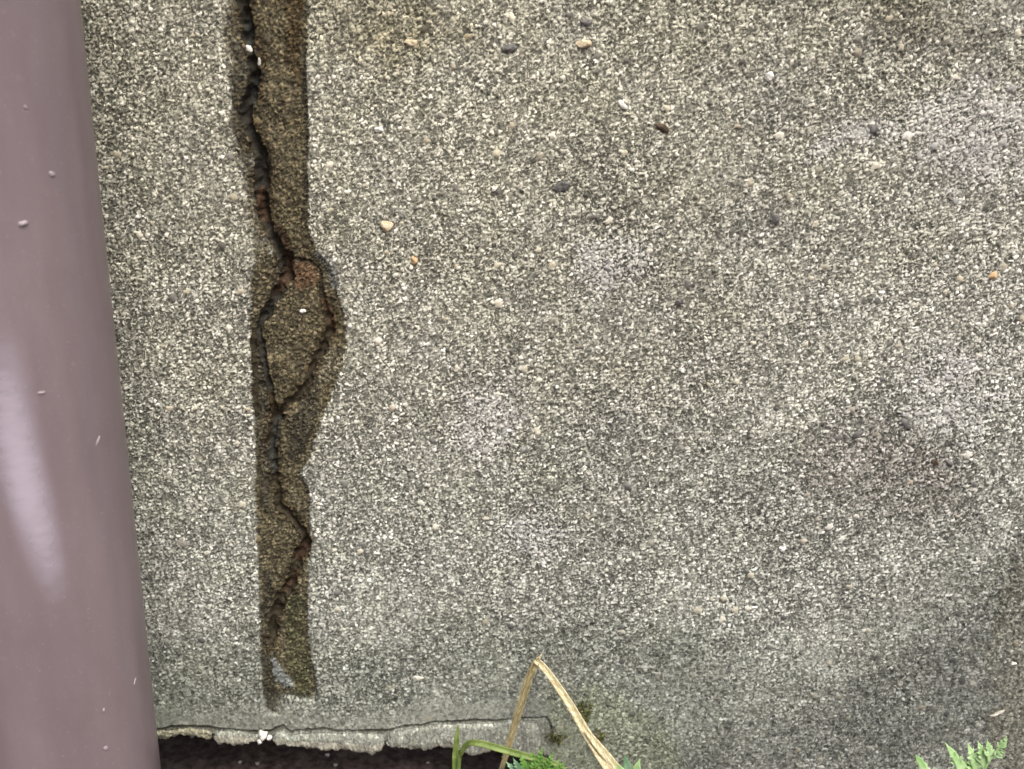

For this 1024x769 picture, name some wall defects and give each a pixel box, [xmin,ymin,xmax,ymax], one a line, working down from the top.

crack [236,0,336,647]